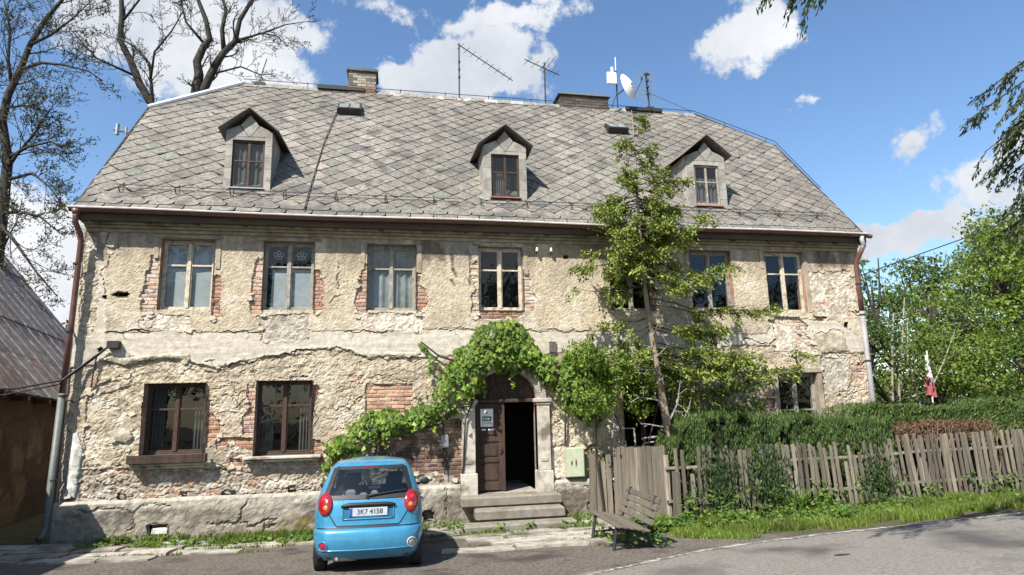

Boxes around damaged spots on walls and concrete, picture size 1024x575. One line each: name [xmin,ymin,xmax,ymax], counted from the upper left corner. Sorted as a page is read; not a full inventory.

spalling [78,232,193,340]
spalling [79,257,327,501]
crack [67,329,422,427]
spalling [353,264,429,333]
flaking render [469,261,536,321]
spalling [768,269,865,394]
flaking render [374,418,462,486]